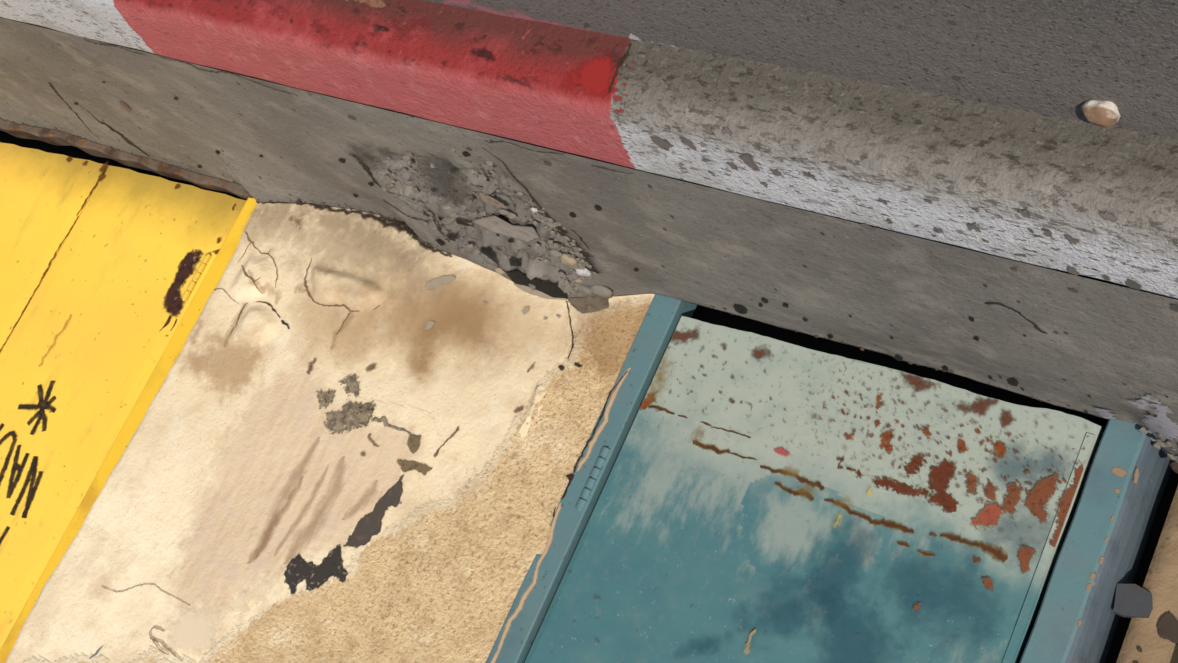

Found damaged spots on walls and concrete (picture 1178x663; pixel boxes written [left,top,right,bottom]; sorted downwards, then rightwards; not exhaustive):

crack [262,154,452,257]
crack [214,232,380,337]
leakage [151,336,445,655]
peeling [22,179,653,663]
corrosion [640,374,687,418]
corrosion [752,348,771,359]
corrosion [693,440,935,557]
corrosion [818,372,1086,573]